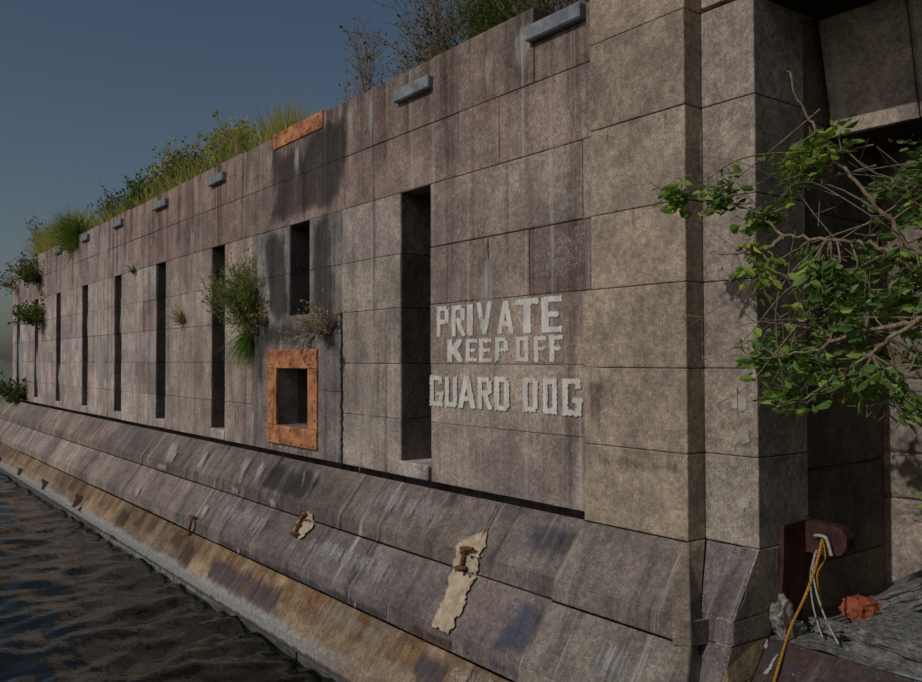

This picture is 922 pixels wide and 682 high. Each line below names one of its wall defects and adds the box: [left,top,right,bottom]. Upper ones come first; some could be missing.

leakage [257,218,334,379]
spalling [293,511,314,539]
spalling [432,531,487,634]